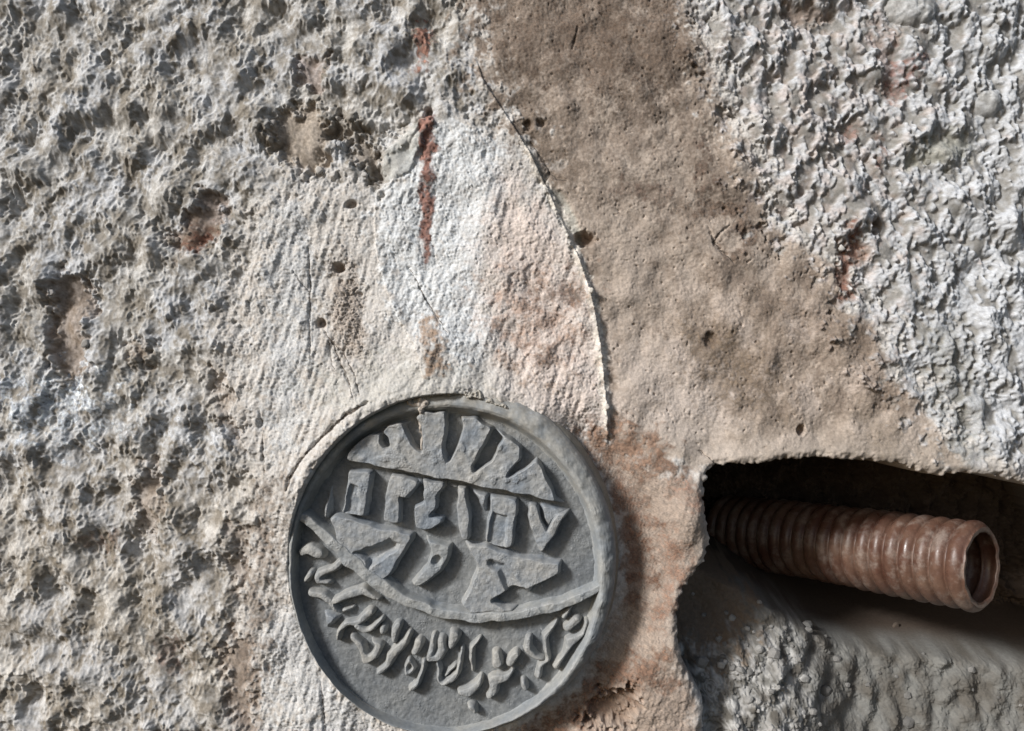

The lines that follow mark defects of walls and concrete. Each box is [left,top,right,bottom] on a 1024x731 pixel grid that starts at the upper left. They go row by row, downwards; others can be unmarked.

rust [413,20,431,73]
rust [417,116,438,263]
crack [530,142,567,184]
spalling [675,456,1024,731]